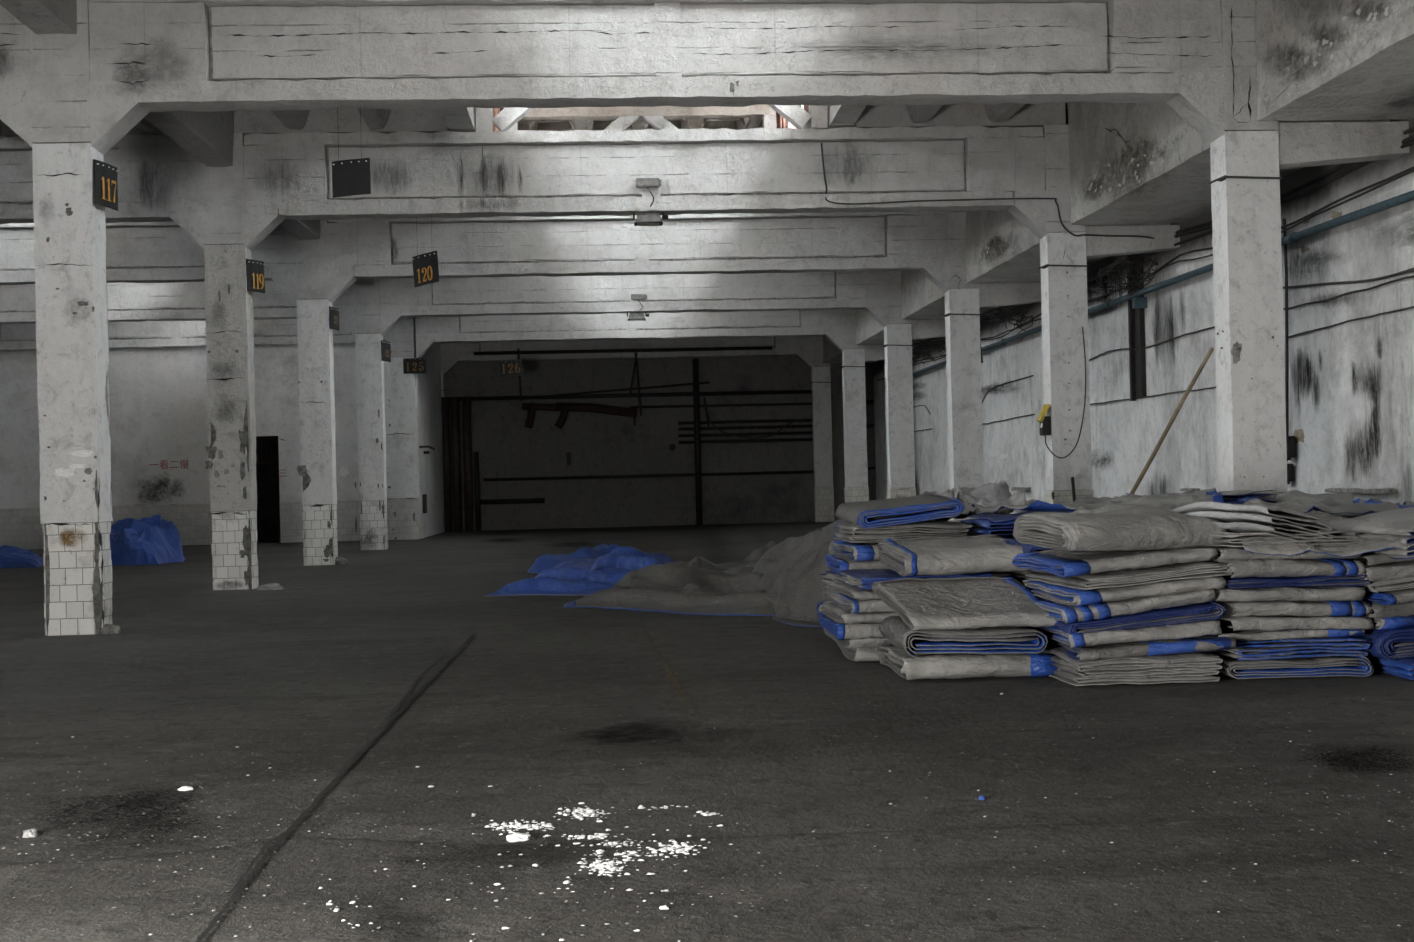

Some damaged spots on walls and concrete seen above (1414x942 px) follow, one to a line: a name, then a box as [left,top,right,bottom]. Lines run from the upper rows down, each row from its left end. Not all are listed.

damp [1294,352,1321,405]
damp [1346,340,1382,477]